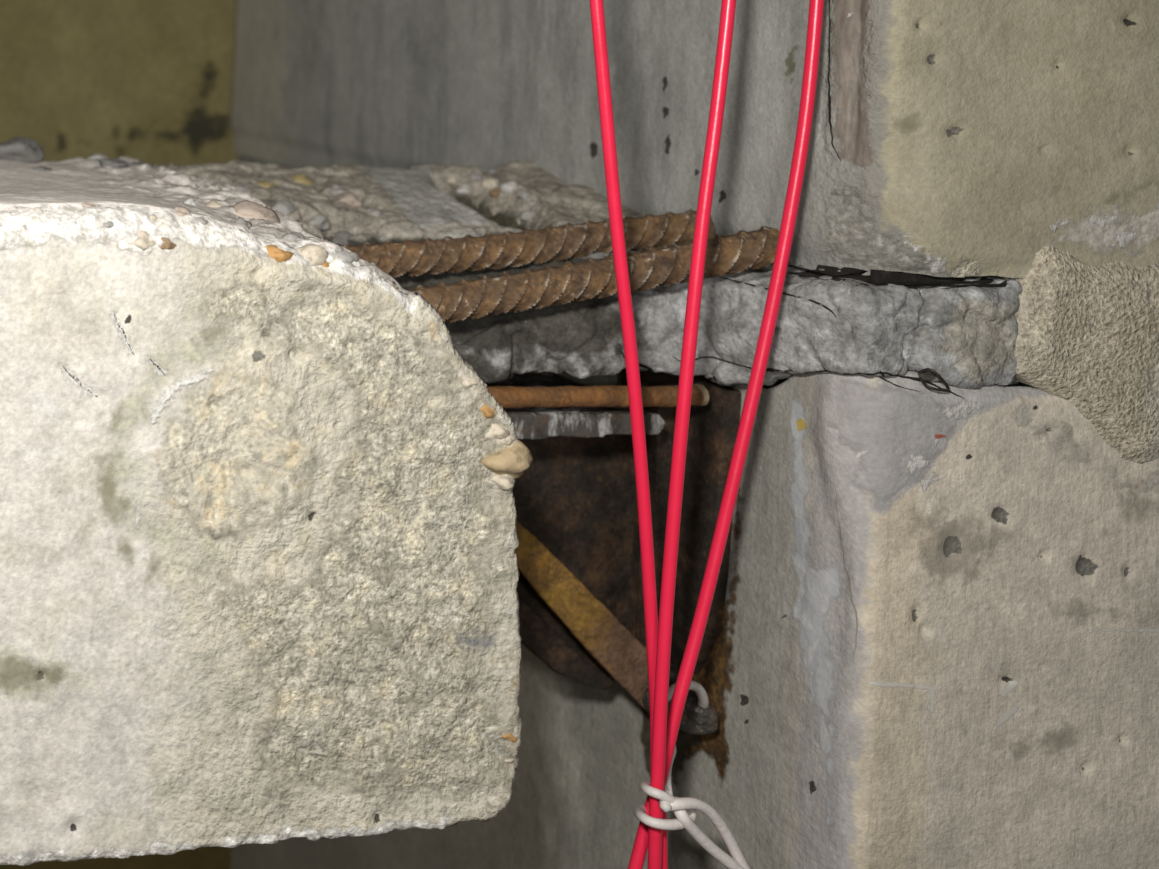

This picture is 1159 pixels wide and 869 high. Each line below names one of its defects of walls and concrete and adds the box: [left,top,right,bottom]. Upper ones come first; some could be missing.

damp [158,108,229,154]
spalling [703,216,779,279]
spalling [821,185,980,278]
peeling [1050,204,1159,260]
crack [720,262,1010,317]
crack [617,348,963,398]
peeling [1015,400,1088,461]
peeling [0,172,696,816]
corrosion [689,576,739,780]